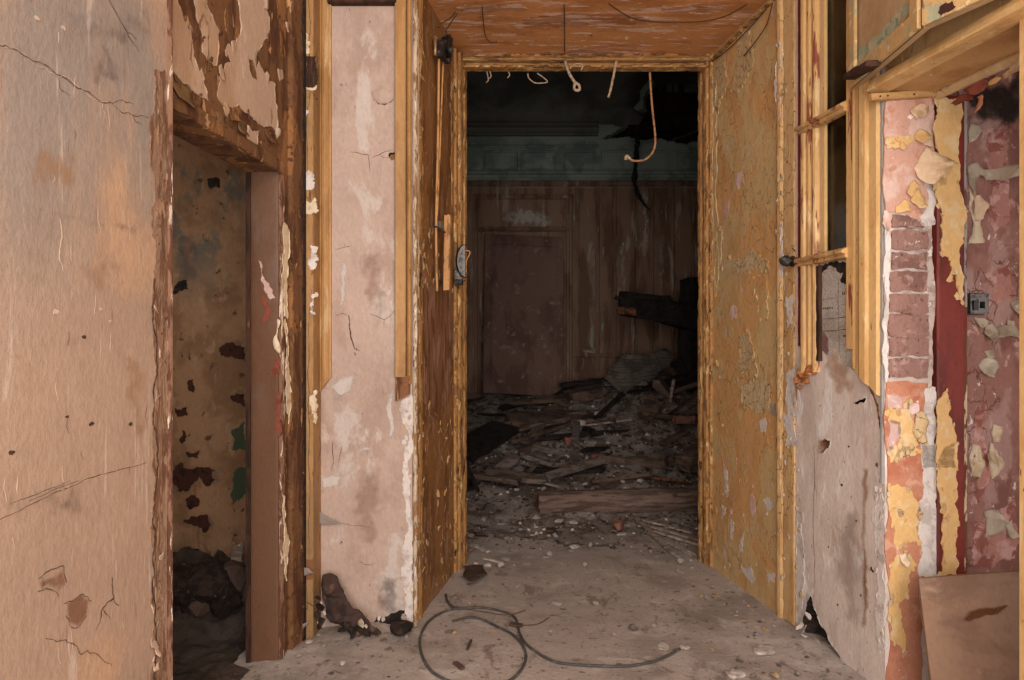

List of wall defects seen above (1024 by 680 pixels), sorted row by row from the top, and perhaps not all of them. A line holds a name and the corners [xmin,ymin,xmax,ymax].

crack [0,45,146,124]
peeling [986,122,1013,242]
spalling [1,0,284,680]
peeling [870,97,992,655]
peeling [972,503,1019,569]
crack [45,577,119,665]